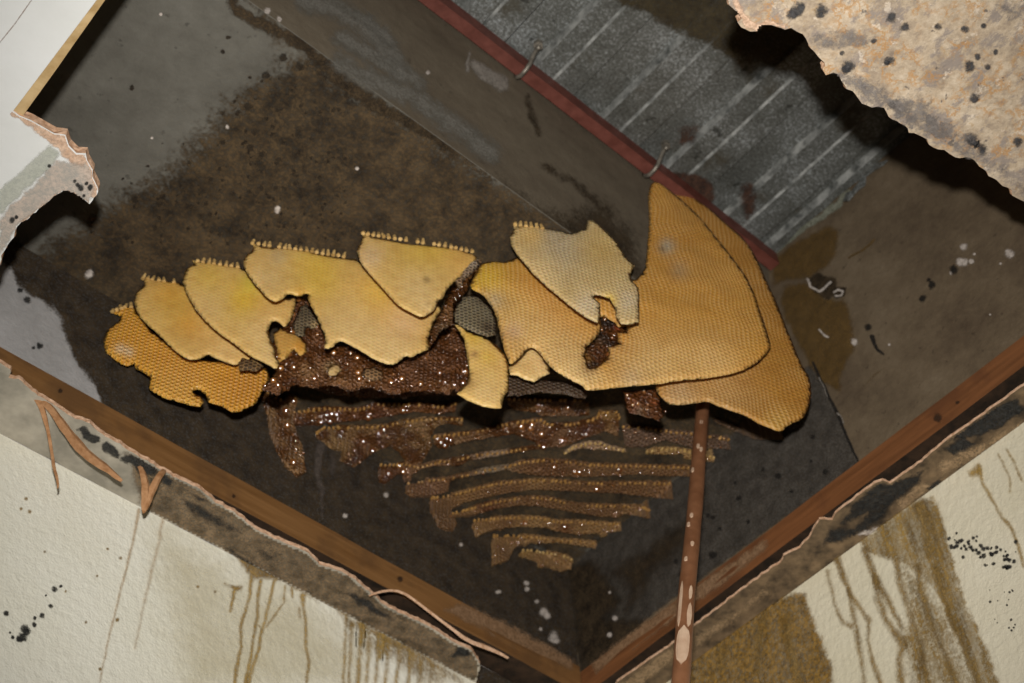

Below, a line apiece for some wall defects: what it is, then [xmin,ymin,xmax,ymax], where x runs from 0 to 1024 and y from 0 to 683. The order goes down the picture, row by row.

leakage [0,0,696,683]
leakage [690,590,832,683]
leakage [696,227,857,582]
leakage [824,399,1024,683]